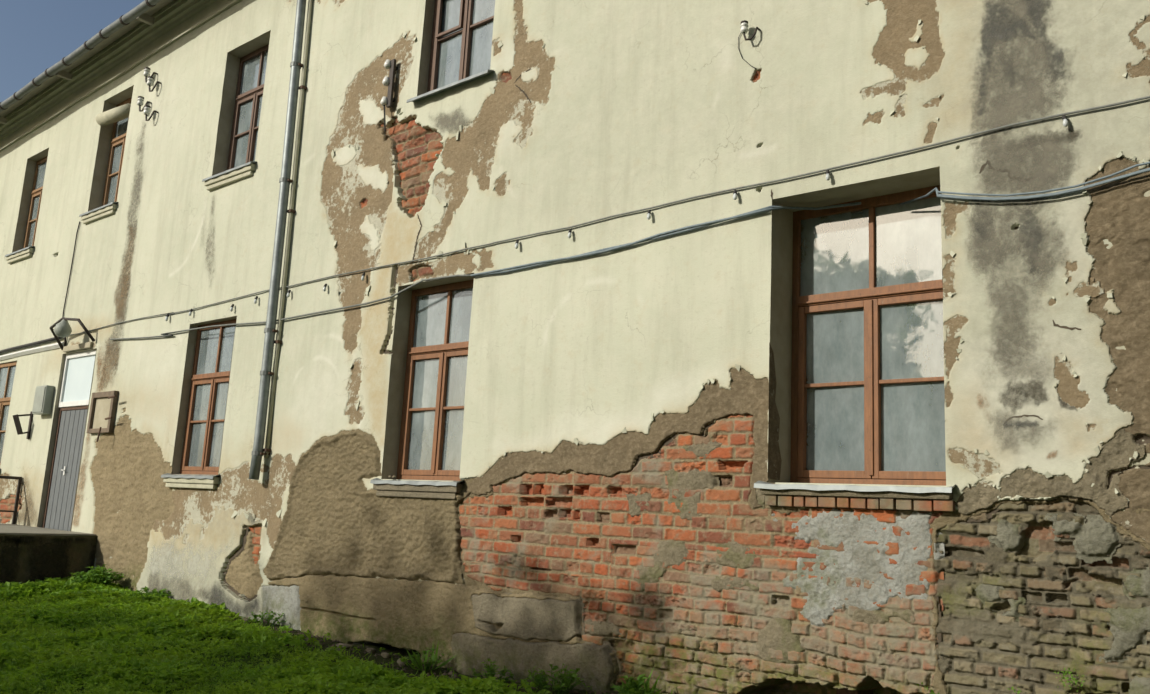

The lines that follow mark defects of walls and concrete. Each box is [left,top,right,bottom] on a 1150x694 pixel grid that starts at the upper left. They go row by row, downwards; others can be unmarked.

damp [101,172,142,385]
flaking render [321,0,555,354]
flaking render [860,0,945,126]
flaking render [923,94,944,144]
damp [970,0,1079,446]
flaking render [1122,14,1150,83]
flaking render [0,473,27,523]
flaking render [90,151,1150,694]